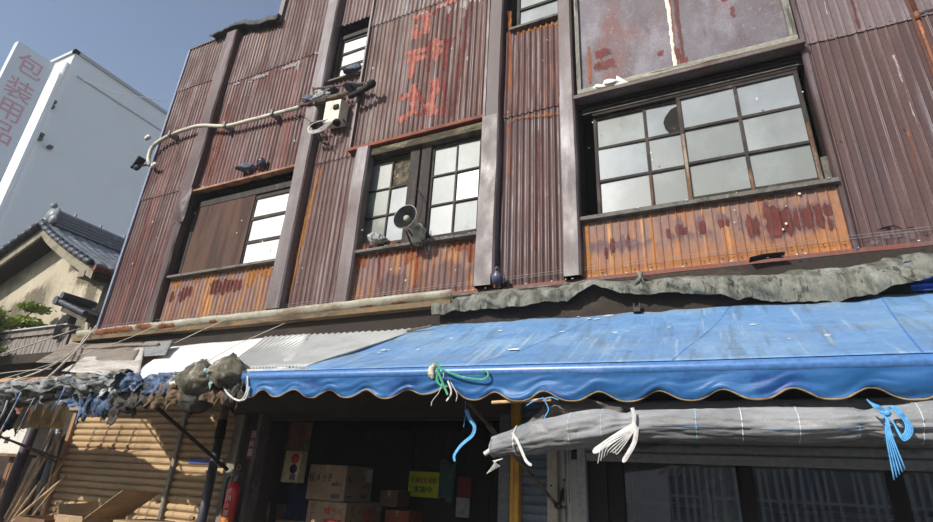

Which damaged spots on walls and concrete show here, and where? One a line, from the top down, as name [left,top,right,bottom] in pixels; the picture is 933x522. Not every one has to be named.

corrosion [508,11,558,102]
corrosion [588,47,615,84]
corrosion [507,112,558,178]
corrosion [666,216,706,239]
corrosion [717,202,834,241]
corrosion [169,278,199,303]
corrosion [209,266,273,295]
corrosion [356,241,422,287]
corrosion [448,240,475,262]
corrosion [585,222,640,273]